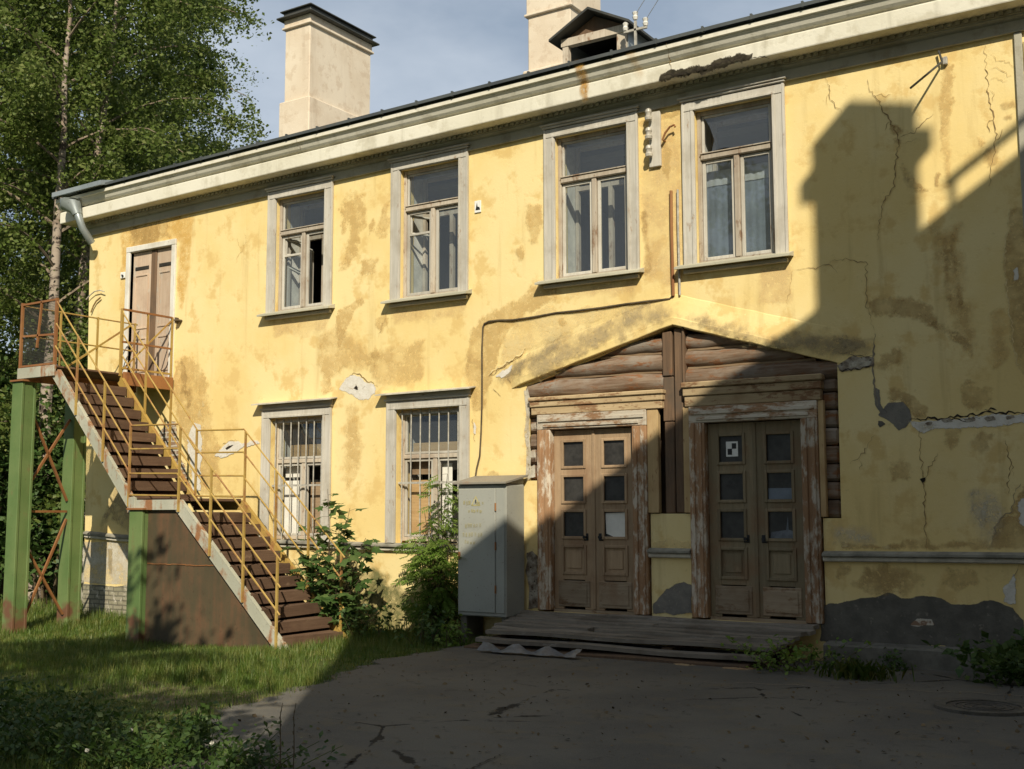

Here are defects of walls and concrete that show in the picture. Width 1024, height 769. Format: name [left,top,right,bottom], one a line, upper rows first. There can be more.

rust [577,63,587,94]
crack [984,53,1014,185]
crack [867,79,928,239]
spalling [836,351,874,372]
flaking render [339,373,376,400]
spalling [910,407,1024,433]
flaking render [215,440,259,458]
crack [918,430,937,547]